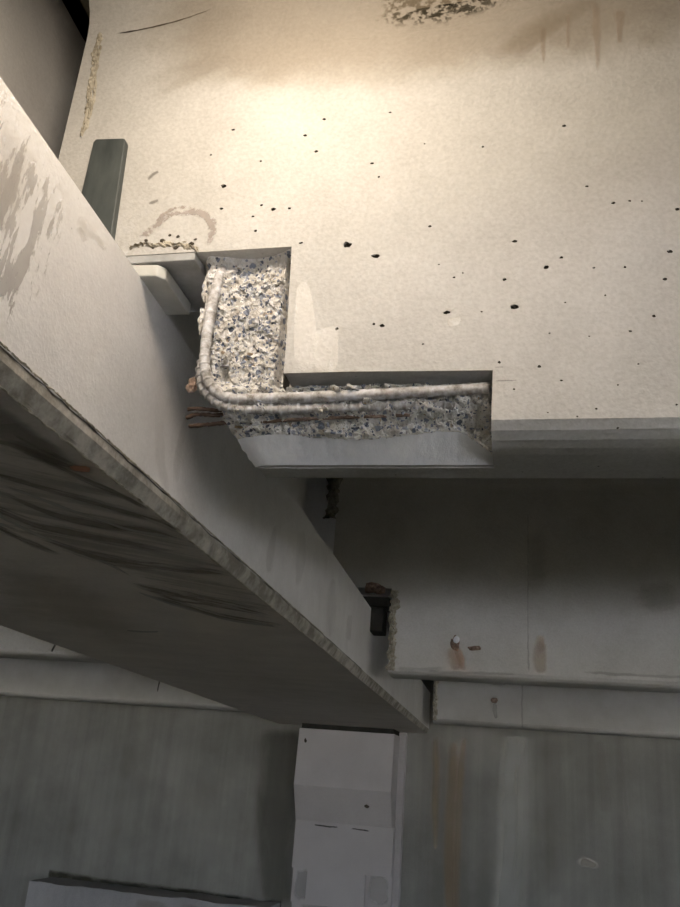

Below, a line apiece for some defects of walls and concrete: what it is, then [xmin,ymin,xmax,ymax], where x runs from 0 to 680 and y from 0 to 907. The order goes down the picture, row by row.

crack [121,11,205,33]
mould [387,0,495,22]
spalling [129,234,199,254]
spalling [185,248,493,467]